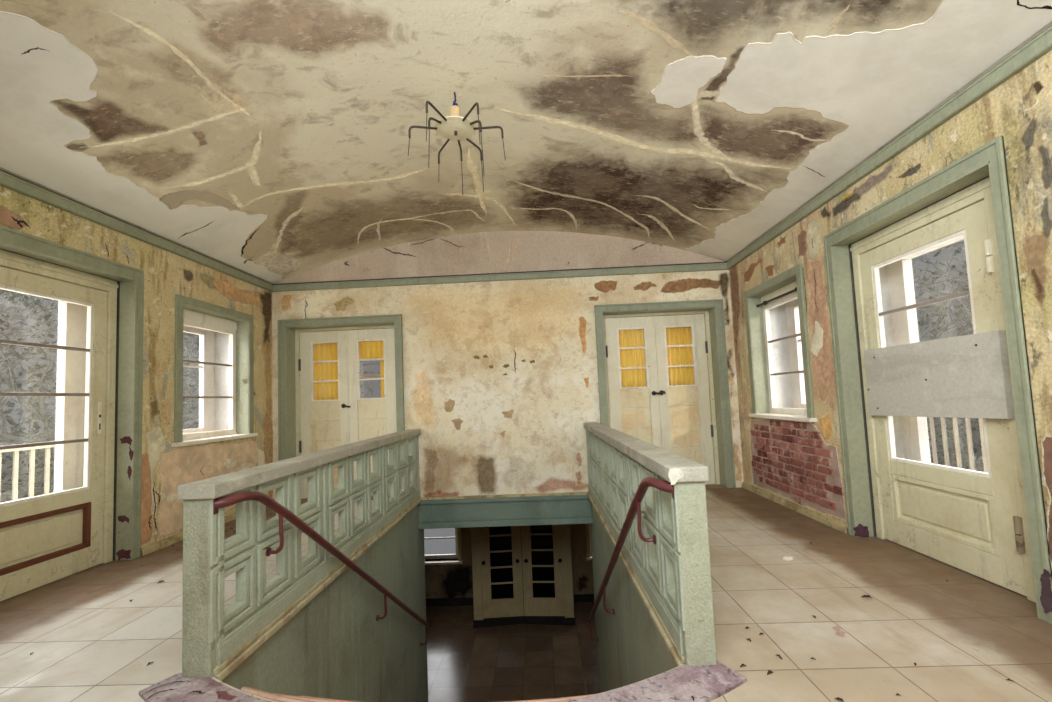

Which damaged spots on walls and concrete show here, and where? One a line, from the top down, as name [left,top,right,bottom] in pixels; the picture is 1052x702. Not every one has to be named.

water stain [662,0,791,35]
water stain [823,0,893,14]
crack [1017,0,1052,9]
peeling [0,11,284,284]
water stain [533,62,832,161]
water stain [701,48,743,100]
peeling [651,0,1052,261]
water stain [518,160,746,236]
peeling [589,281,617,301]
peeling [634,278,720,293]
peeling [116,424,265,561]
flaking render [750,419,869,537]